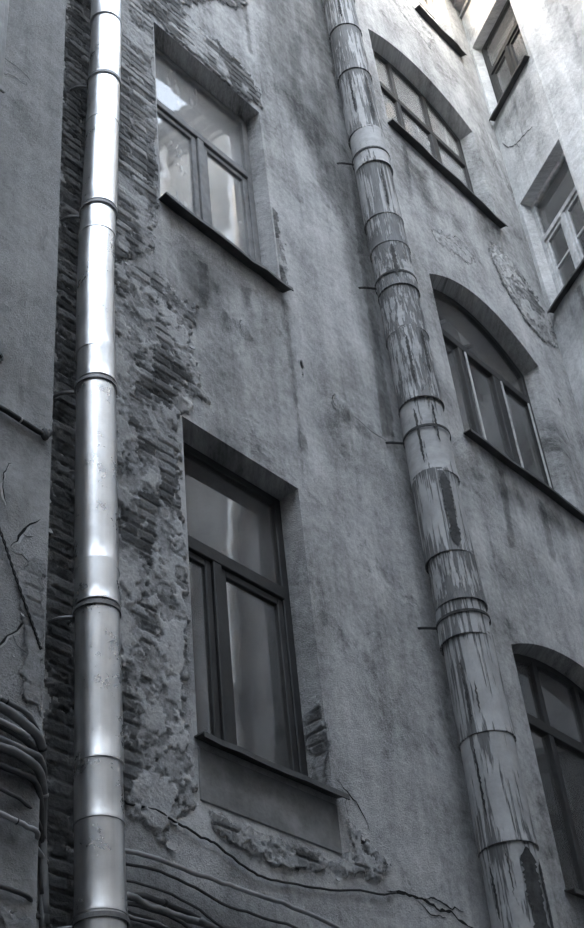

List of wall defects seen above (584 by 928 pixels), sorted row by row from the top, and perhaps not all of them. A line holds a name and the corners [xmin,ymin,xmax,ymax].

flaking render [272,208,292,292]
spalling [489,241,558,348]
flaking render [12,0,91,928]
spalling [114,0,263,851]
crack [10,519,41,564]
crack [0,622,26,653]
flaking render [302,695,330,784]
spalling [209,811,393,882]
crack [387,890,473,928]